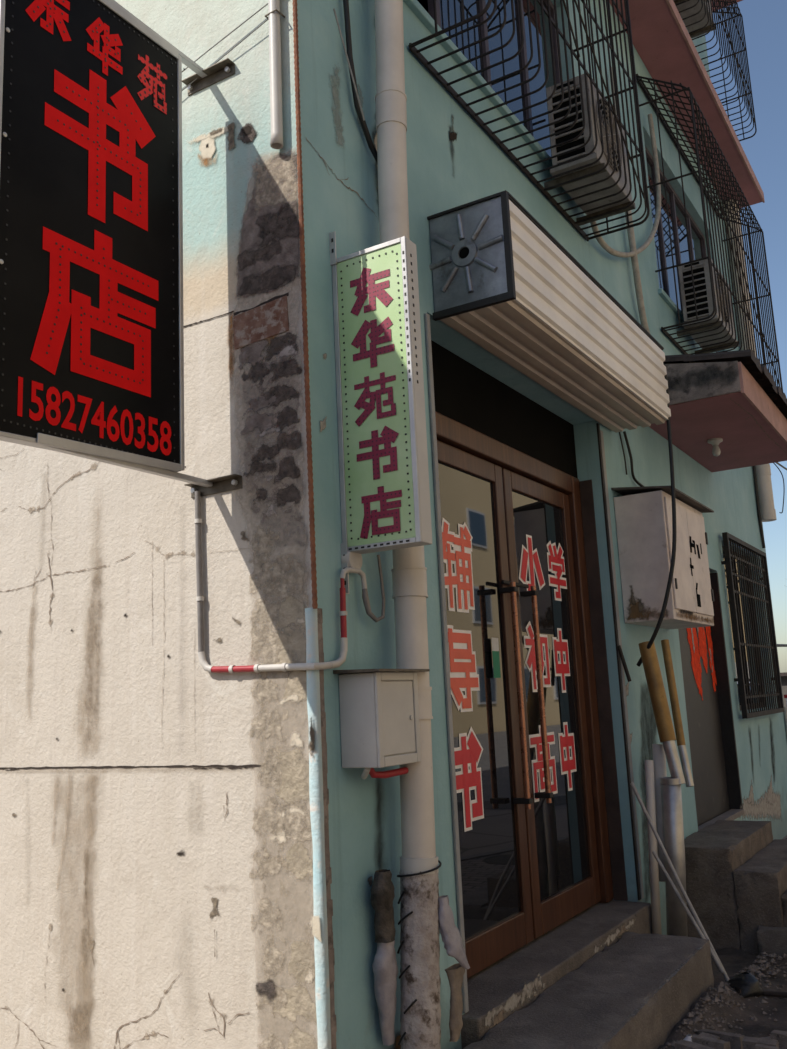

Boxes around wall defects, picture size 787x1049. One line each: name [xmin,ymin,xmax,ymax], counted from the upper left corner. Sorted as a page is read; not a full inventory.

flaking render [189,122,256,166]
crack [0,464,274,771]
spalling [232,151,321,1049]
crack [2,1006,55,1049]
crack [114,977,178,1049]
crack [204,992,254,1036]